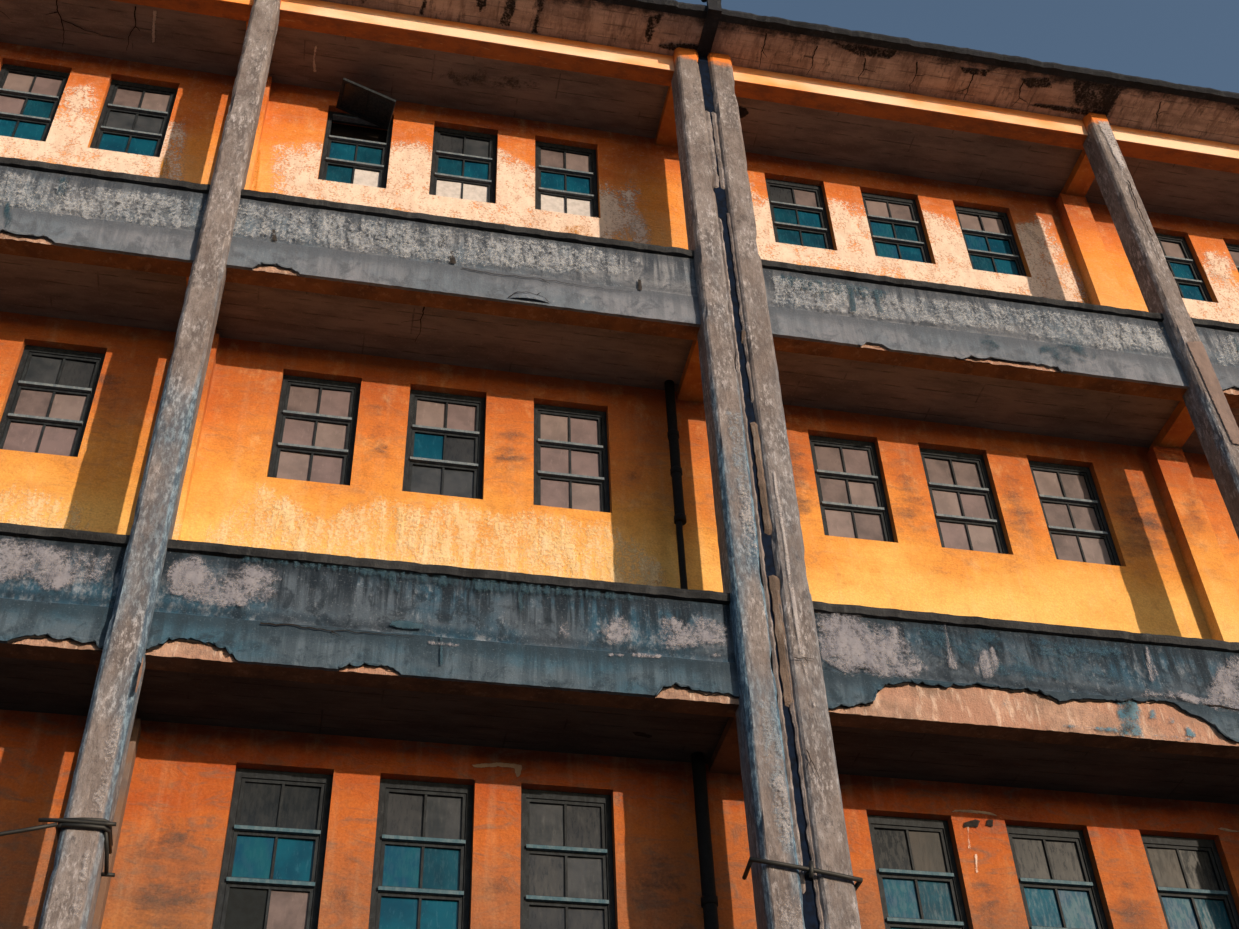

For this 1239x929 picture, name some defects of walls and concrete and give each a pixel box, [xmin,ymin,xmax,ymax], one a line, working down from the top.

crack [46,0,140,47]
leakage [500,0,516,26]
leakage [532,0,545,33]
peeling [1182,252,1239,444]
peeling [773,472,807,674]
spalling [135,635,238,692]
spalling [339,661,400,676]
spalling [813,614,1239,746]